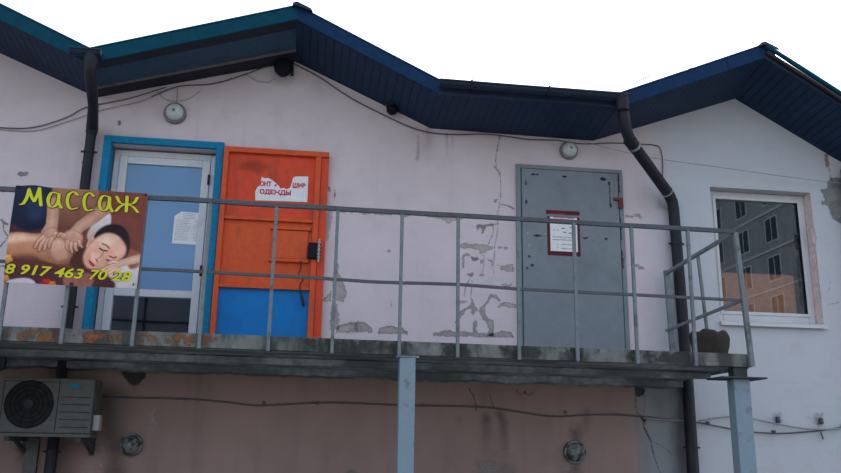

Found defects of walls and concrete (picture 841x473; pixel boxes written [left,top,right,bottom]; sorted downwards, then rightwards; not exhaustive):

spalling [821,178,841,223]
peeling [460,243,514,276]
peeling [323,264,408,334]
peeling [433,294,517,338]